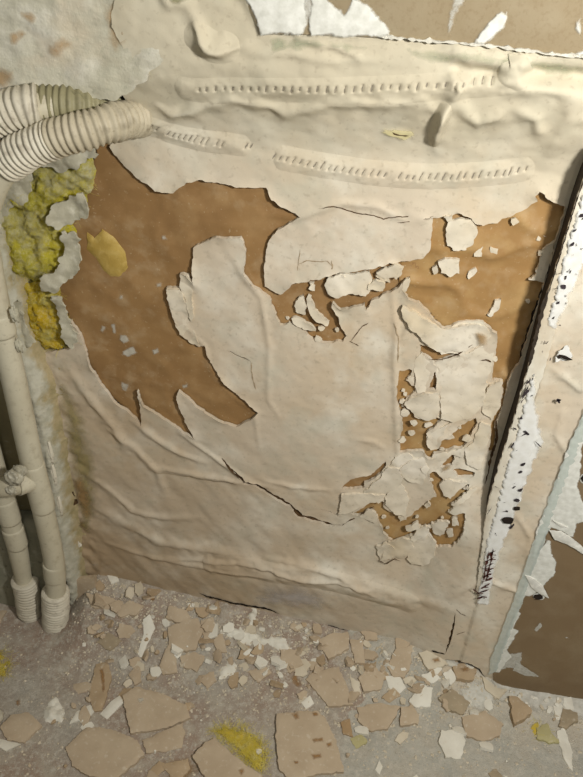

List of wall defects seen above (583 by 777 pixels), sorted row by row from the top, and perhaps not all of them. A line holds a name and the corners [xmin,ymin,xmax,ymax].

crack [322,206,433,223]
spalling [0,213,87,605]
leakage [66,395,92,528]
crack [157,459,374,524]
peeling [60,143,564,566]
crack [432,609,465,654]